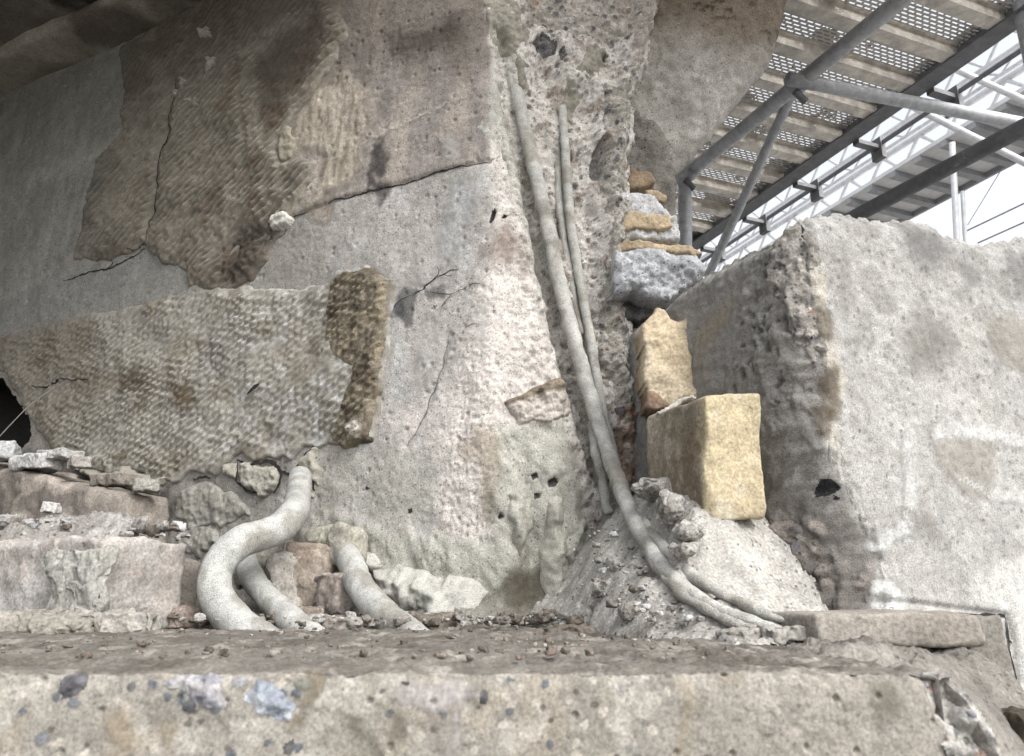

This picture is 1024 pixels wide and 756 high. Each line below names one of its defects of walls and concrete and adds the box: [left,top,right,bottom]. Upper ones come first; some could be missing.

crack [64,79,177,281]
crack [278,162,488,238]
crack [394,267,481,307]
spalling [0,378,32,450]
crack [408,323,479,444]